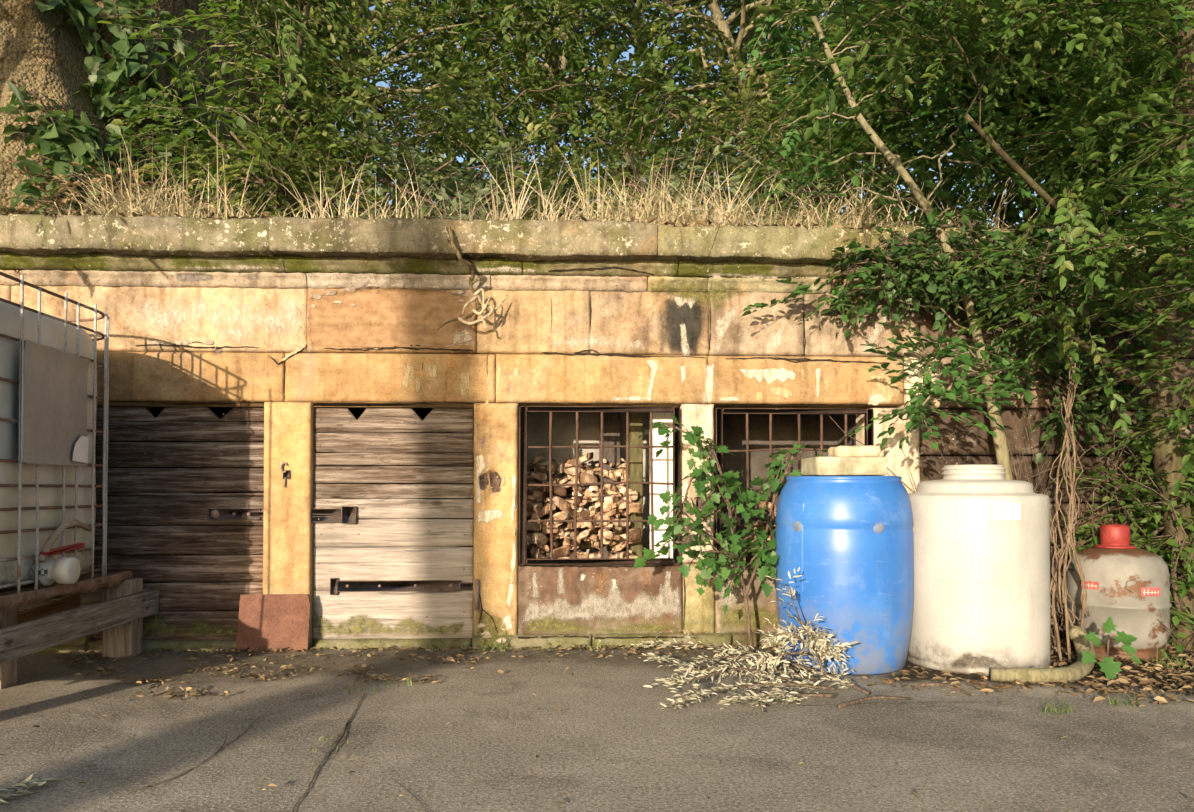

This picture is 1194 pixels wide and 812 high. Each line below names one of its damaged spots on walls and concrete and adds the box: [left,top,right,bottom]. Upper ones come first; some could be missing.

crack [136,340,488,399]
damp [661,297,702,383]
damp [704,365,738,402]
peeling [741,368,795,400]